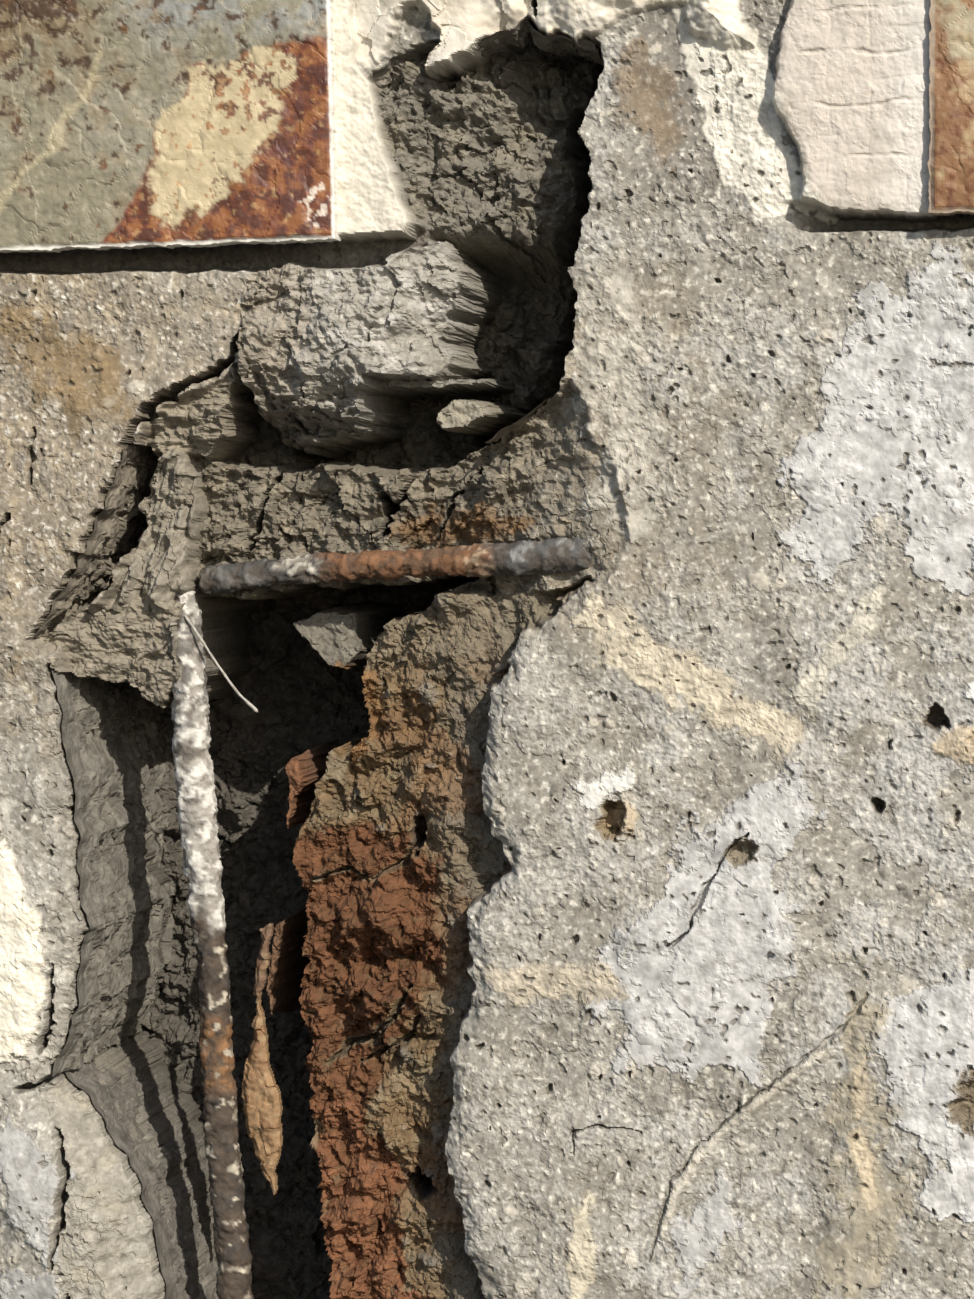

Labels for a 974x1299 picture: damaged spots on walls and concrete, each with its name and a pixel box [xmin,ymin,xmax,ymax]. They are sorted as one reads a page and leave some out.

crack [530,0,539,18]
crack [0,512,13,548]
crack [26,426,38,485]
spalling [0,19,637,1299]
rust [336,661,380,762]
rust [242,923,283,1195]
rust [292,824,444,1299]
crack [648,992,870,1265]